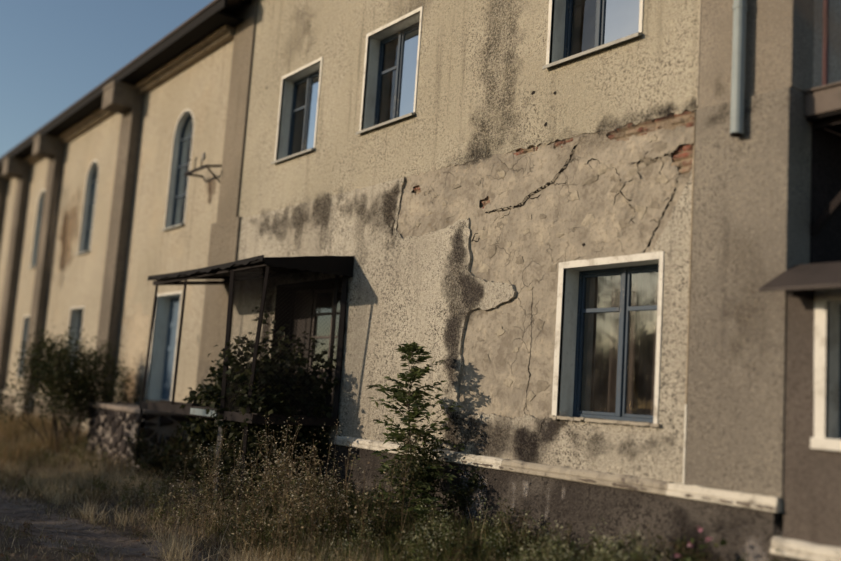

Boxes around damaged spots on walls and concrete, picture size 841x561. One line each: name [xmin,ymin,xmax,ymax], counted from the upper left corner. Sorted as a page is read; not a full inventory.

damp [260,186,399,238]
damp [444,228,483,382]
crack [524,290,547,435]
peeling [397,109,694,420]
crack [471,132,678,253]
damp [445,409,560,463]